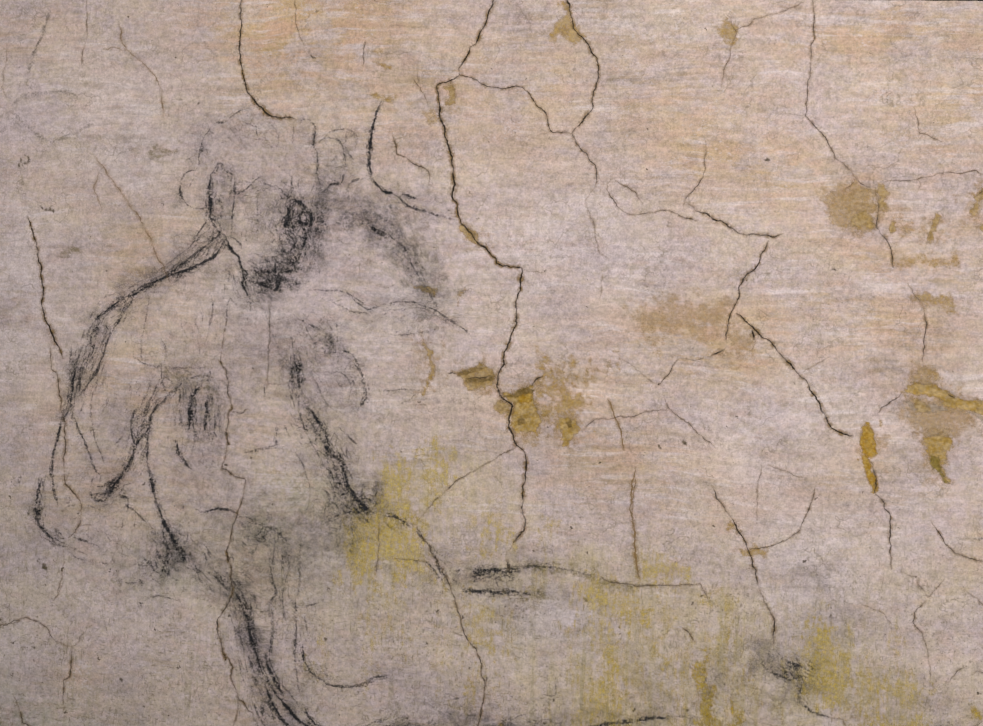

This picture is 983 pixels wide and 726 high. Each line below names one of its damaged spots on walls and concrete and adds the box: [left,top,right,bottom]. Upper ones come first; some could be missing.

crack [238,3,293,120]
crack [394,0,852,543]
crack [28,218,82,536]
spalling [457,363,496,394]
spalling [494,385,541,442]
spalling [557,418,580,447]
spalling [857,421,881,493]
spalling [923,428,952,483]
spalling [904,368,983,421]
crack [216,359,249,711]
crack [604,472,702,587]
crack [715,492,814,580]